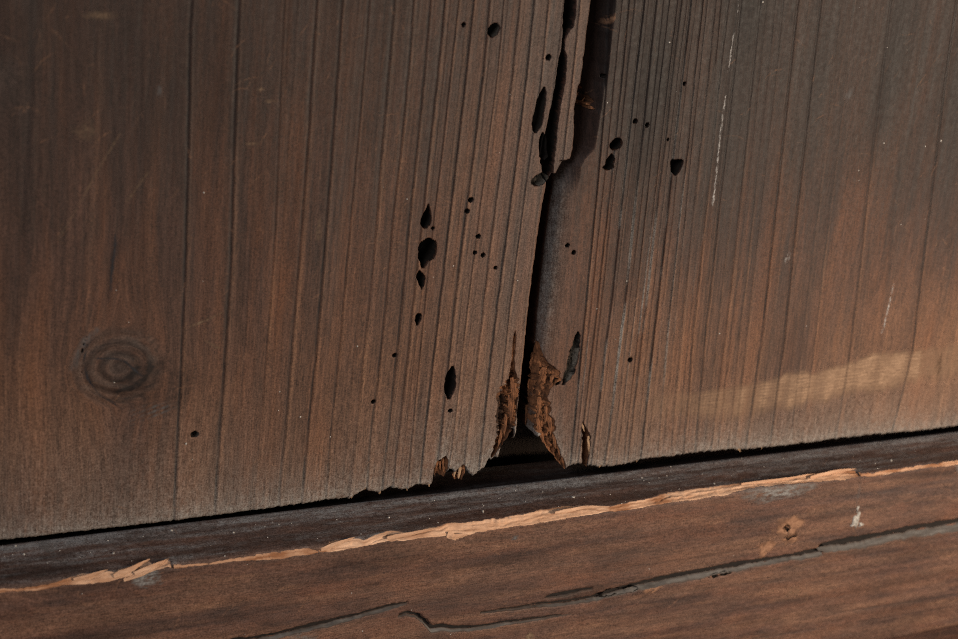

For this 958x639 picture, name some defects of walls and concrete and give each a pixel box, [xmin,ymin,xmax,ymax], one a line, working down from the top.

spalling [497,331,580,465]
peeling [433,456,465,479]
crack [231,518,958,639]